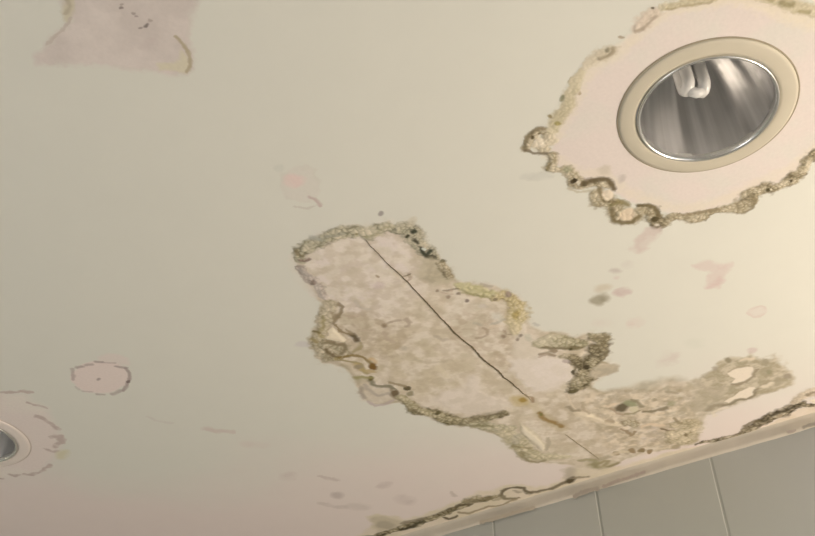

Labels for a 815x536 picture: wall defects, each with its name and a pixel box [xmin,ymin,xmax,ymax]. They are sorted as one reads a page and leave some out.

peeling [30,0,205,79]
crack [368,243,531,401]
peeling [284,215,712,468]